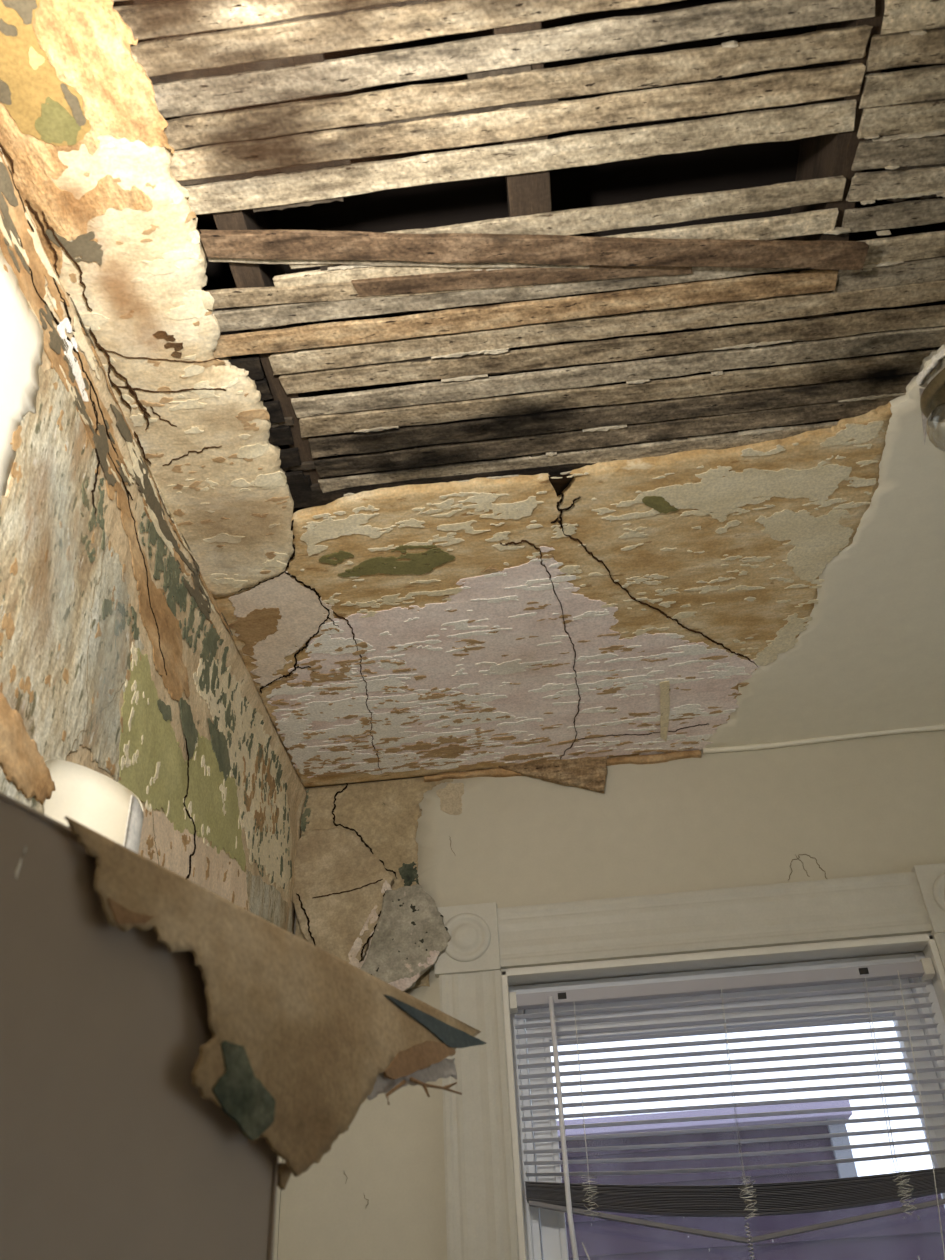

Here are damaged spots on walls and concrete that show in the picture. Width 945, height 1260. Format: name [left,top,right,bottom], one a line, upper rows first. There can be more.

crack [0,143,226,754]
flaking render [0,0,892,941]
flaking render [916,348,945,386]
crack [220,519,382,772]
crack [500,488,758,759]
crack [183,738,196,879]
crack [296,783,397,962]
flaking render [407,969,430,990]
peeling [367,1058,457,1100]